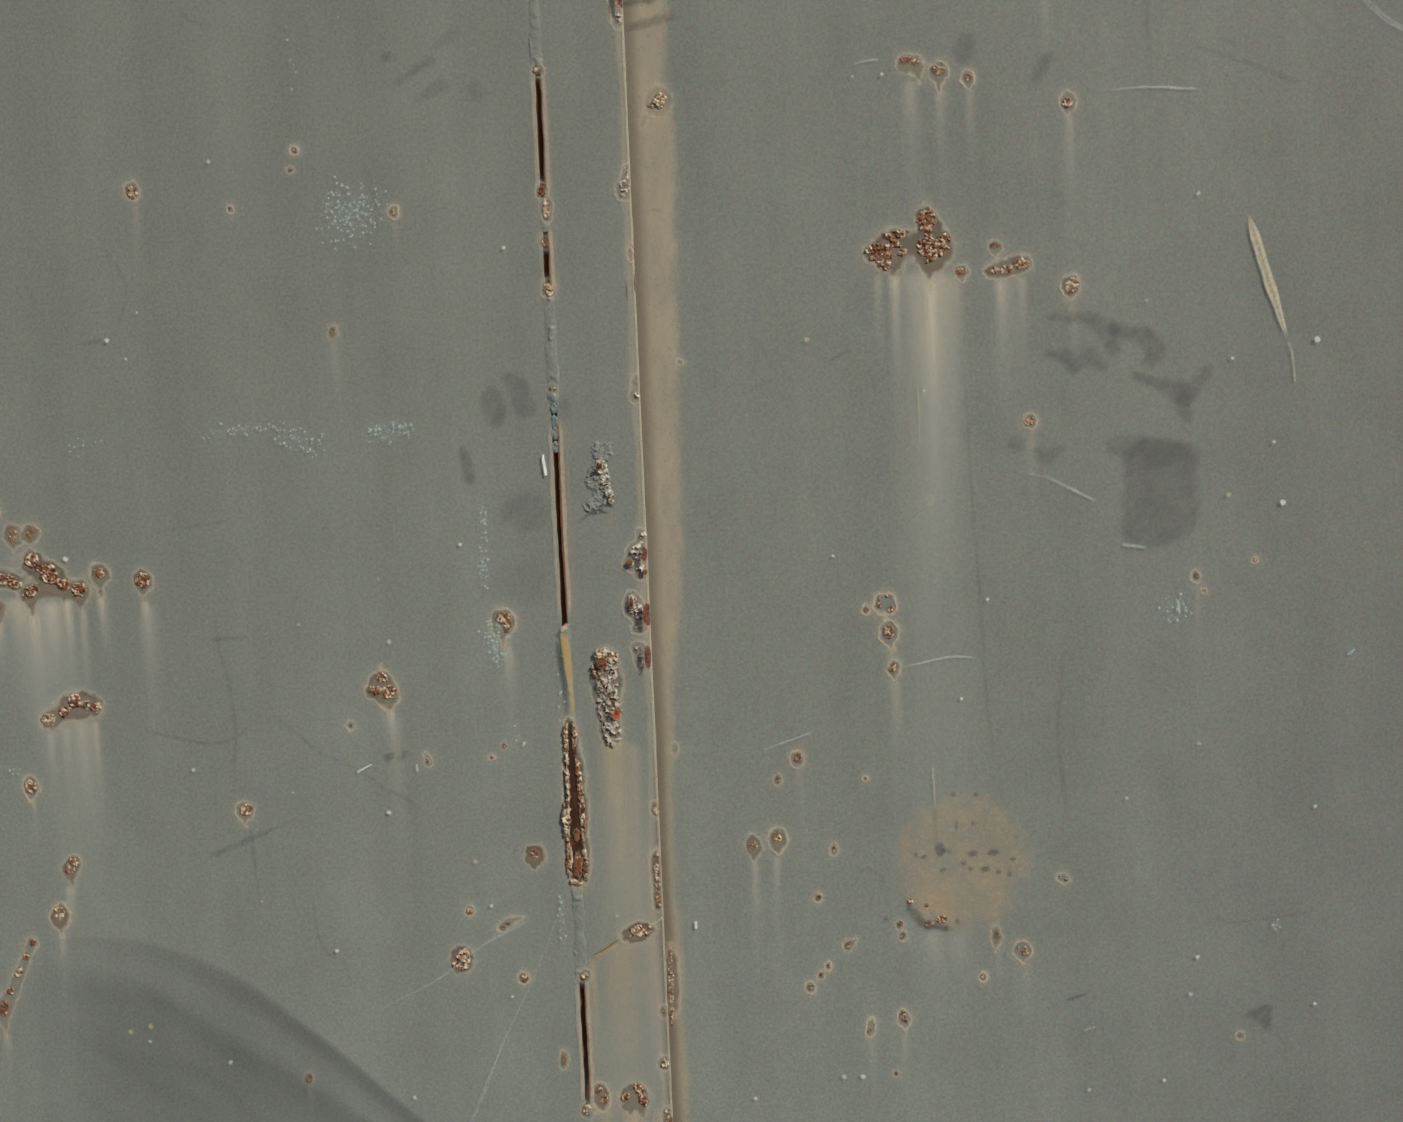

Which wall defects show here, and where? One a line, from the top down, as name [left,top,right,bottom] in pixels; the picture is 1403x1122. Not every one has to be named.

rust [864,206,967,352]
rust [984,243,1030,276]
rust [0,526,107,625]
rust [596,0,687,1122]
rust [561,624,572,692]
rust [861,592,900,681]
rust [40,691,102,728]
rust [366,669,399,716]
rust [561,716,591,886]
rust [526,846,544,869]
rust [451,946,473,973]
rust [582,1073,648,1122]